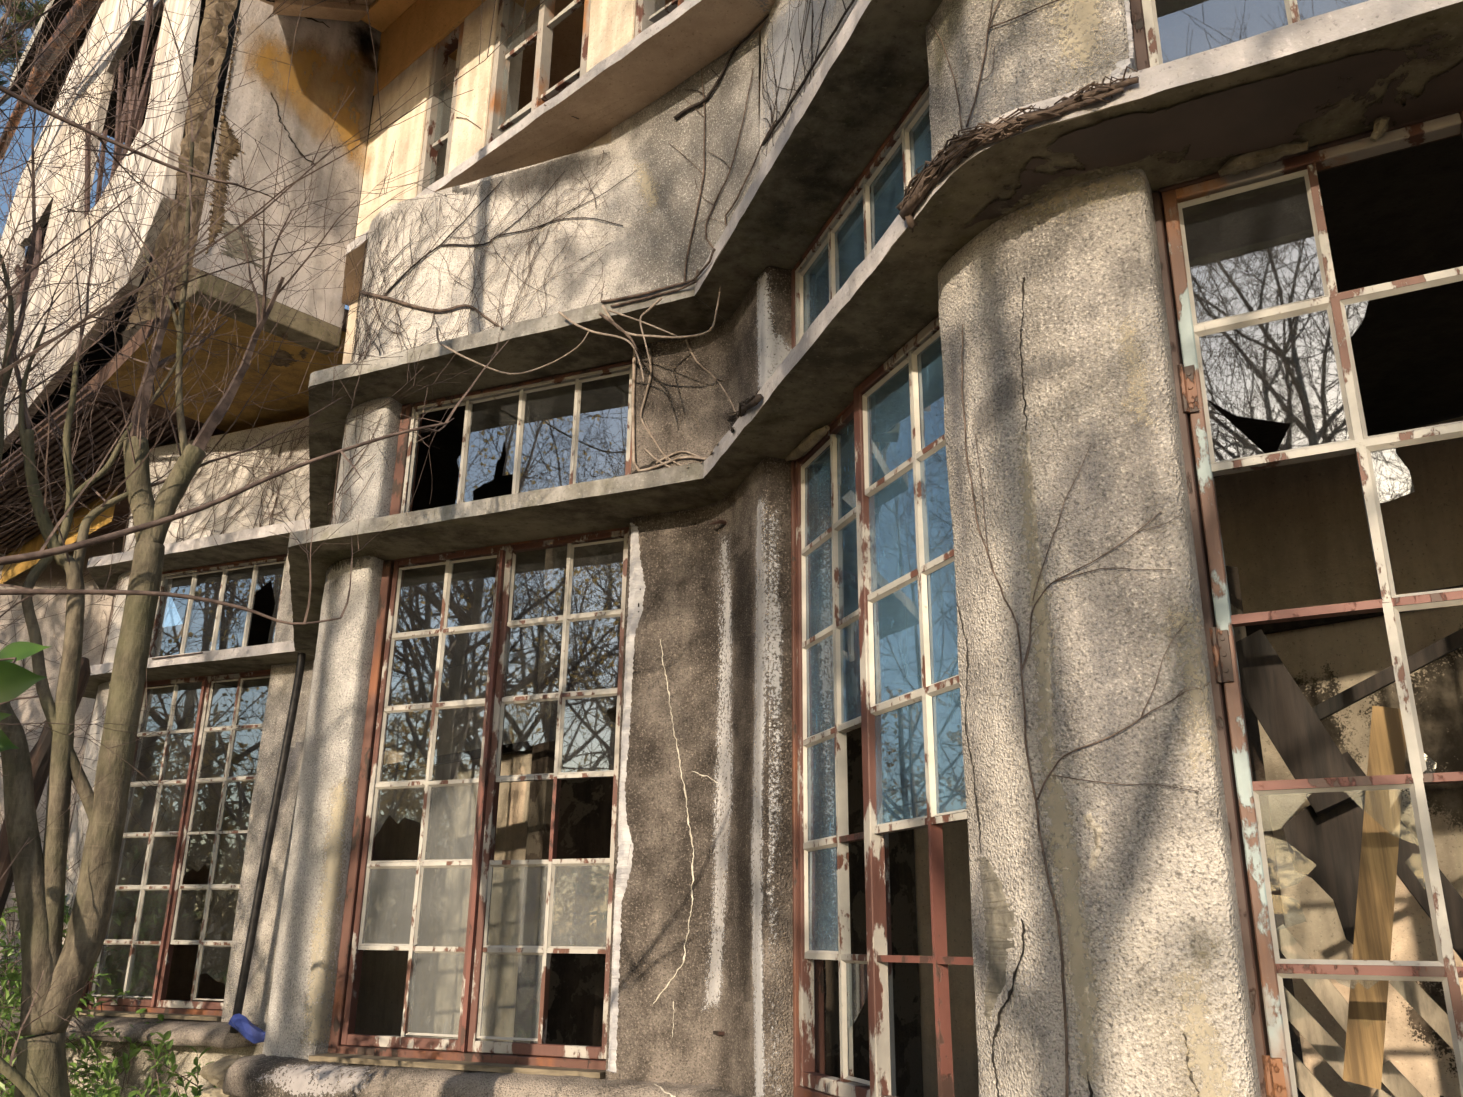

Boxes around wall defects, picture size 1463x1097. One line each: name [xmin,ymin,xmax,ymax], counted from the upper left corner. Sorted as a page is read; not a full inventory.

leakage [247,41,362,158]
leakage [510,155,576,194]
leakage [757,272,792,390]
crack [1019,277,1027,431]
leakage [705,536,734,1009]
leakage [751,503,783,1097]
crack [986,918,1025,1097]
crack [1085,1071,1093,1097]
crack [1182,1033,1200,1097]